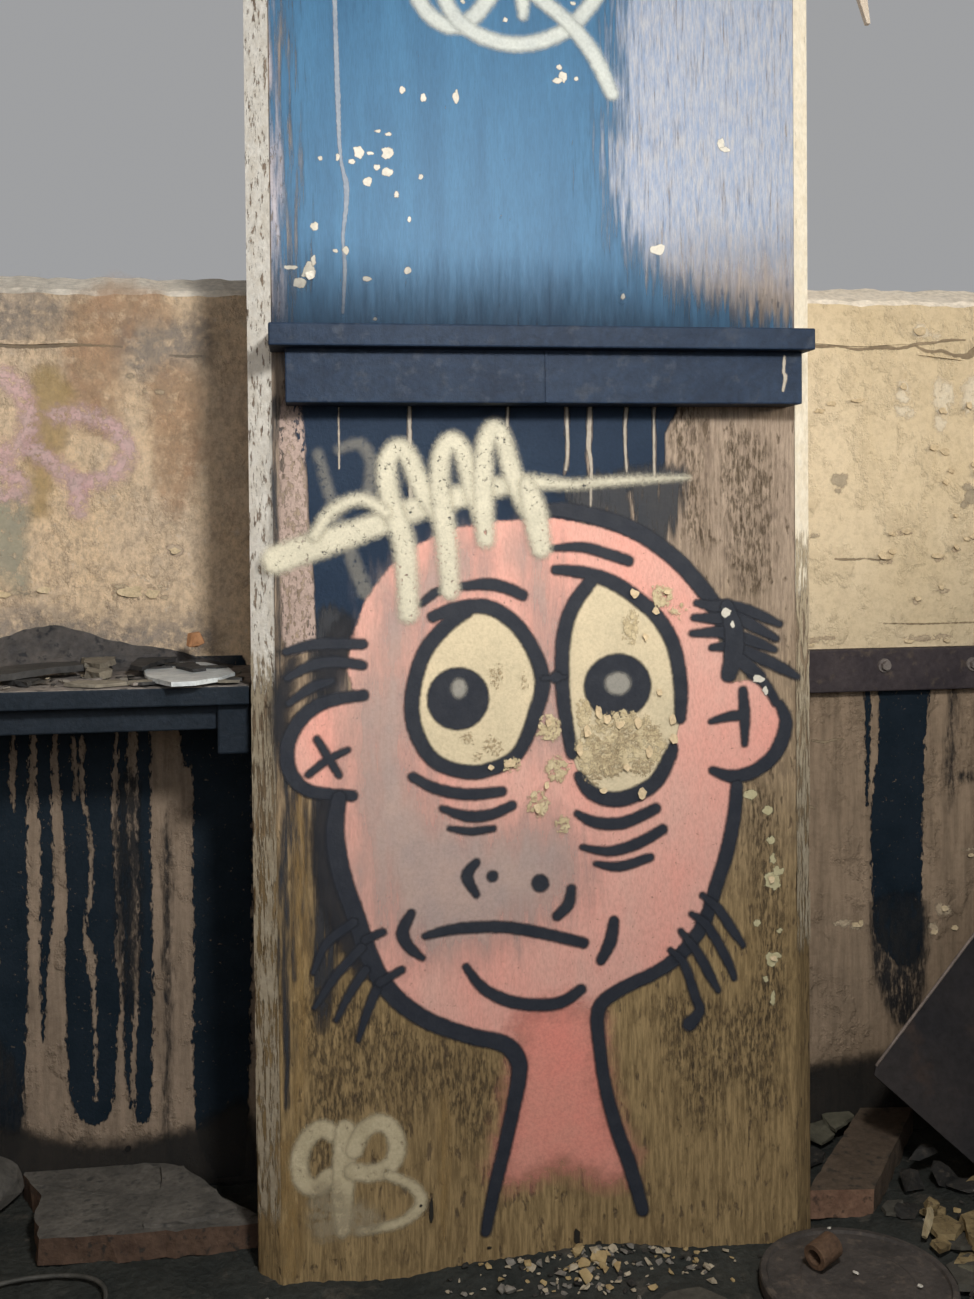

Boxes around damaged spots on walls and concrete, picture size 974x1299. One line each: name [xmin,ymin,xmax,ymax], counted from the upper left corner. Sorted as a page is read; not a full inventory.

spalling [552,64,578,84]
spalling [318,129,394,186]
peeling [793,0,808,328]
crack [815,336,974,361]
peeling [764,352,865,948]
peeling [462,732,521,772]
peeling [526,699,678,833]
peeling [743,789,773,815]
peeling [763,952,782,1006]